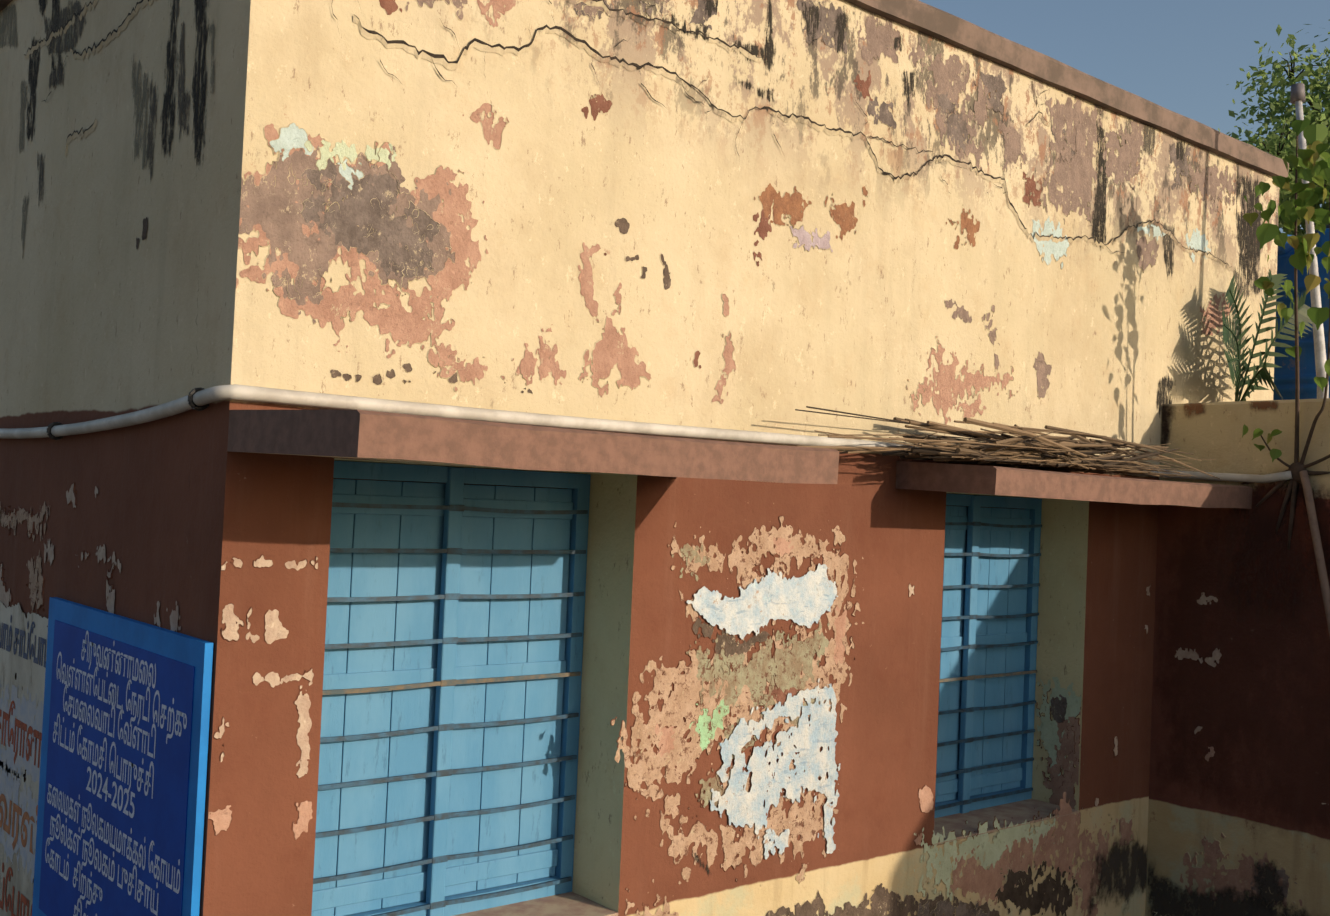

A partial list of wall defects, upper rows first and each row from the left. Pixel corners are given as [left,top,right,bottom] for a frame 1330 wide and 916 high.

damp [0,0,87,259]
crack [65,118,97,158]
crack [24,0,156,102]
damp [131,0,216,183]
peeling [236,122,651,398]
crack [332,0,1233,271]
peeling [753,183,868,266]
peeling [797,0,1242,273]
peeling [220,603,289,644]
peeling [251,668,314,779]
peeling [766,677,1136,916]
damp [1089,839,1309,916]